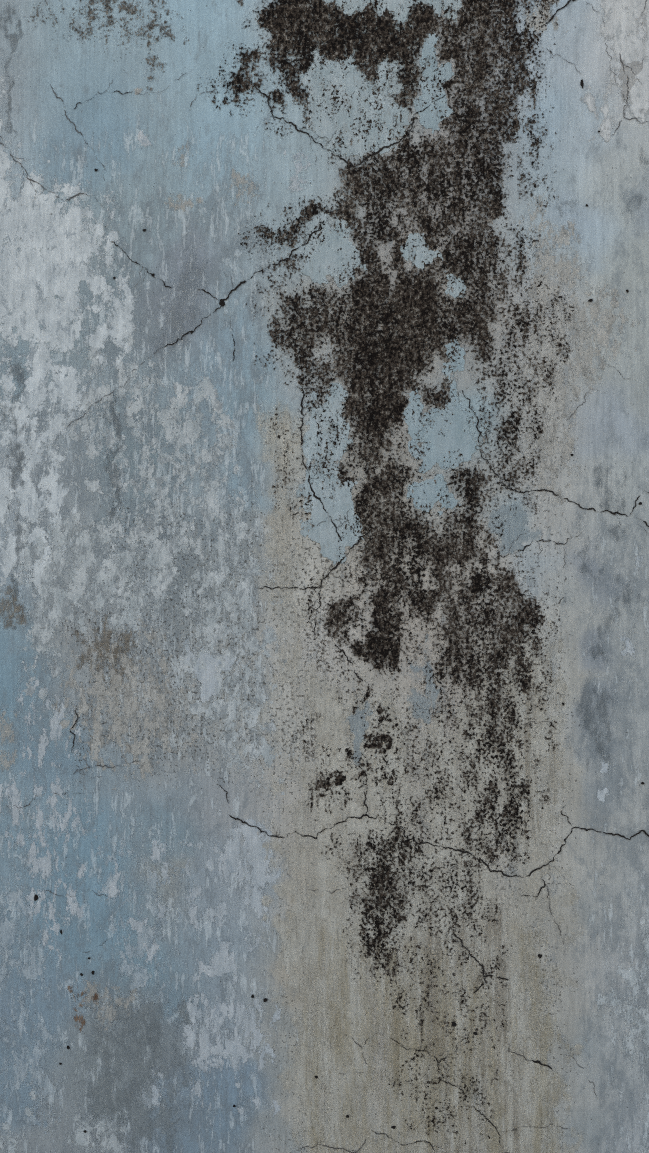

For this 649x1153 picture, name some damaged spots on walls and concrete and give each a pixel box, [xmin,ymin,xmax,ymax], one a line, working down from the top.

crack [0,73,322,434]
water stain [197,0,580,1153]
crack [462,390,649,580]
crack [217,773,649,944]